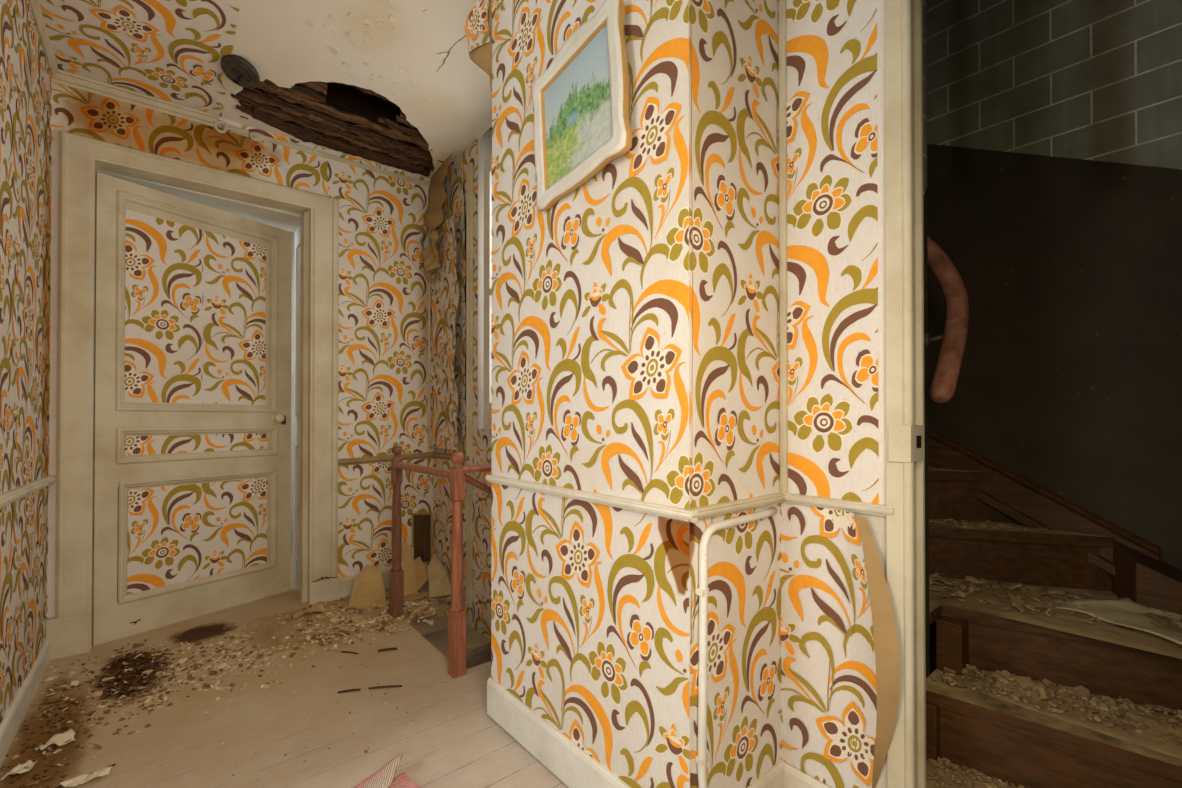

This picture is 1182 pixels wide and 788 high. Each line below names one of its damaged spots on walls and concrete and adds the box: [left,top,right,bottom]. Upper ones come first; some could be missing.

spalling [293,81,435,174]
flaking render [848,511,887,583]
flaking render [876,755,887,788]